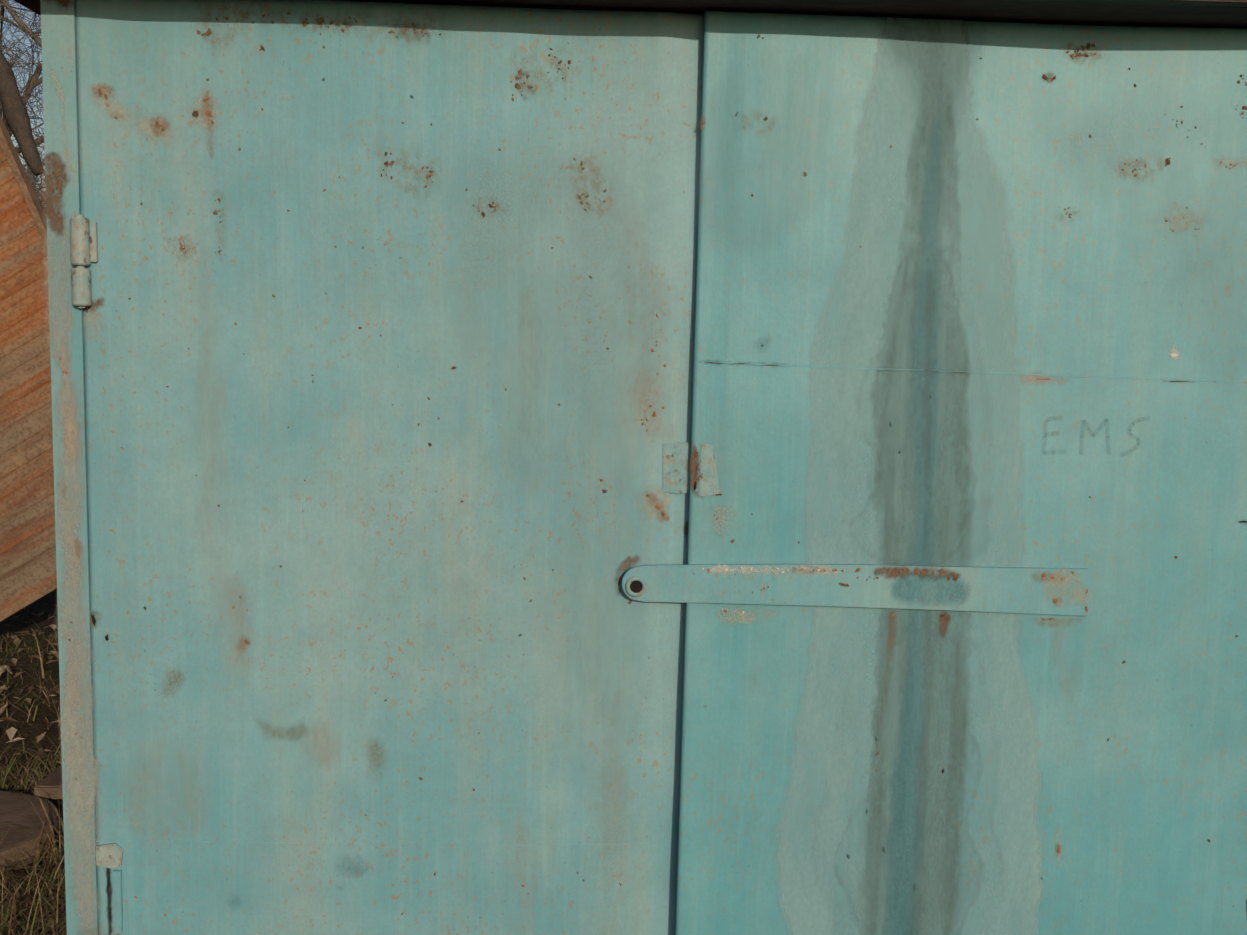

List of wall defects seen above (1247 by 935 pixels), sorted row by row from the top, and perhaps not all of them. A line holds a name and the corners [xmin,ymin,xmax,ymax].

corrosion [192,97,214,127]
corrosion [41,152,67,233]
water stain [811,18,977,566]
corrosion [617,556,638,604]
corrosion [702,565,962,598]
water stain [781,606,955,935]
water stain [972,612,1041,935]